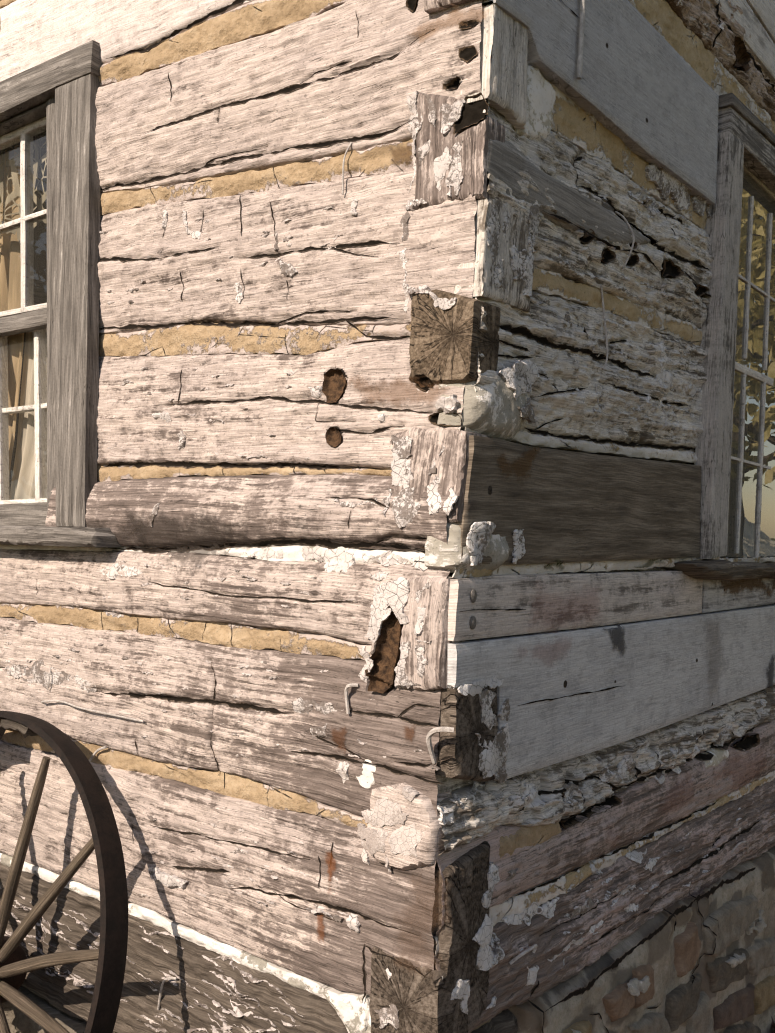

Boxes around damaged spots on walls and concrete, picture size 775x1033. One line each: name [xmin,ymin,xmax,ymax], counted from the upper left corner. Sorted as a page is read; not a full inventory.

crack [139,29,435,136]
crack [99,310,404,340]
peeling [302,545,432,689]
peeling [437,676,511,826]
crack [511,724,760,814]
peeling [4,896,100,959]
peeling [306,904,361,933]
peeling [472,862,658,988]
crack [528,818,763,1033]
peeling [126,955,304,1033]
peeling [374,1004,399,1029]
peeling [450,979,470,1014]